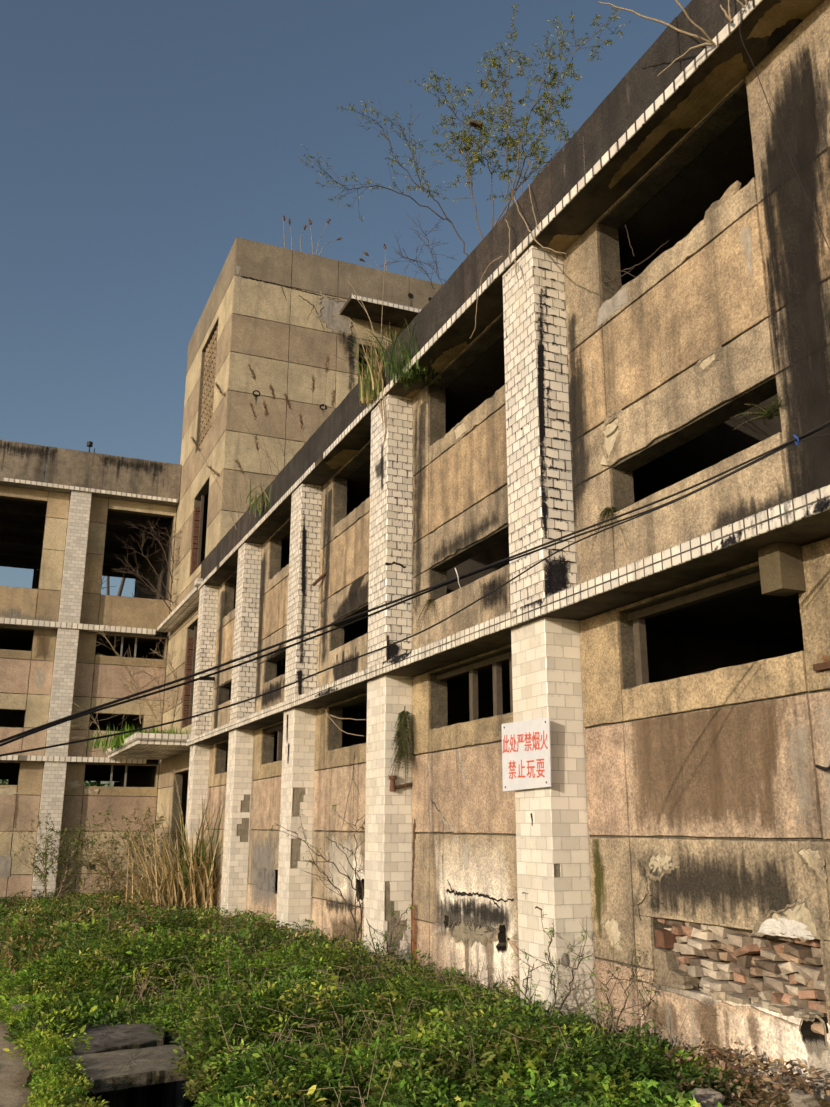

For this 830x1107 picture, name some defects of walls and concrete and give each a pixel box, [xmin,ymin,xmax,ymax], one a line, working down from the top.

flaking render [316,291,354,336]
water stain [714,47,830,550]
water stain [102,458,162,481]
water stain [474,267,592,612]
peeling [236,795,250,842]
peeling [292,788,305,817]
peeling [290,839,301,868]
peeling [385,881,407,959]
crack [411,799,449,959]
water stain [439,900,509,988]
crack [446,880,542,918]
water stain [639,857,794,919]